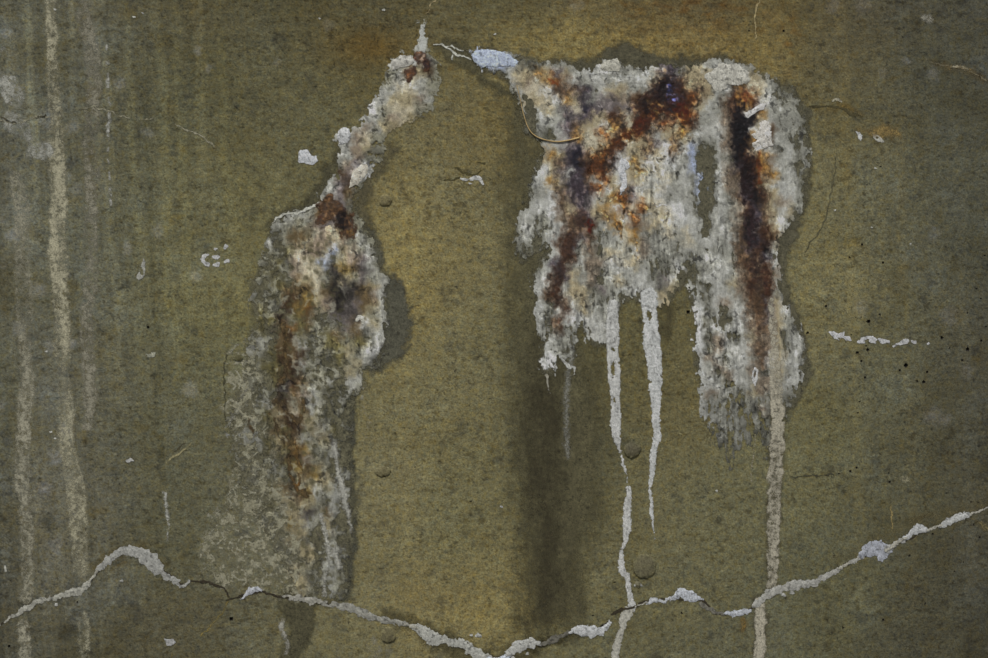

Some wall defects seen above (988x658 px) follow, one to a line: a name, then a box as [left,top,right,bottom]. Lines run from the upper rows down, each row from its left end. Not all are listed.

rust [404,51,430,83]
efflorescence [0,0,112,603]
rust [268,321,309,498]
rust [315,193,357,239]
damp [200,19,813,658]
rust [526,64,708,337]
rust [721,84,776,381]
crack [790,471,834,479]
efflorescence [17,622,31,658]
crack [0,506,988,658]